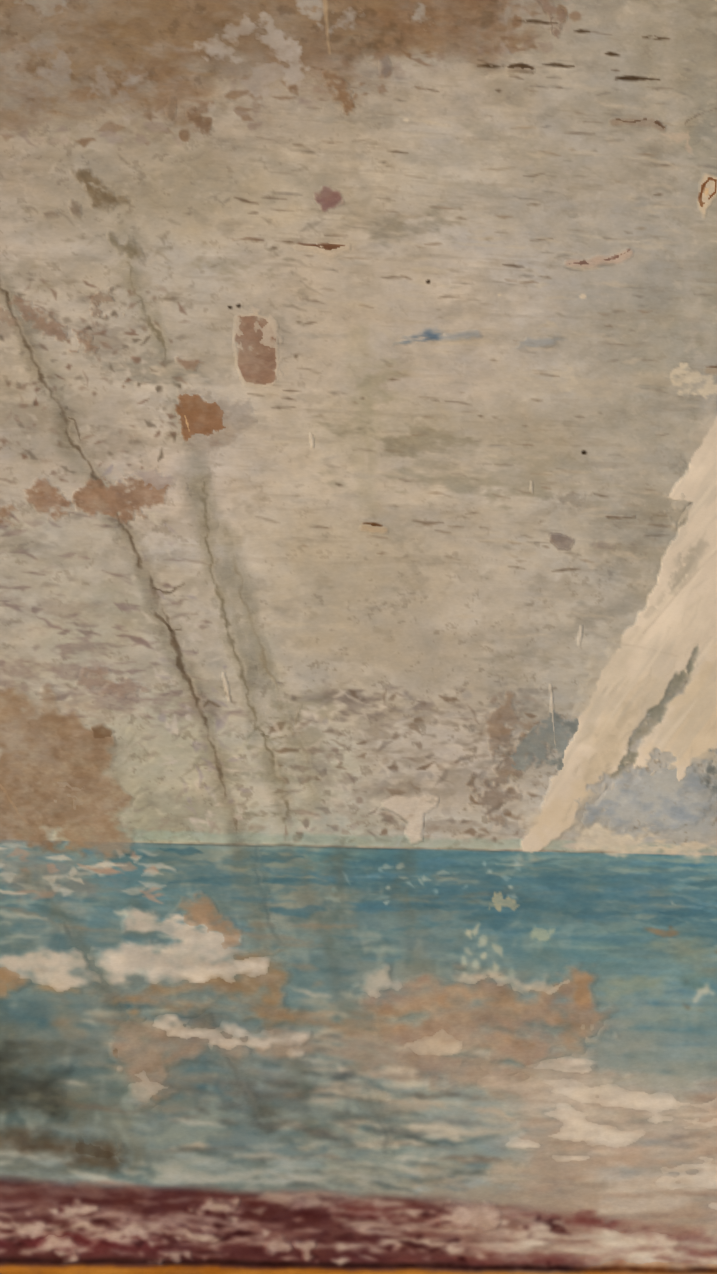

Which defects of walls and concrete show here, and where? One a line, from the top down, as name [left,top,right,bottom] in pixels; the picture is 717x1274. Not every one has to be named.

peeling [172,303,284,460]
peeling [0,465,189,528]
crack [0,255,330,838]
peeling [546,530,617,553]
peeling [0,662,152,863]
peeling [347,959,717,1267]